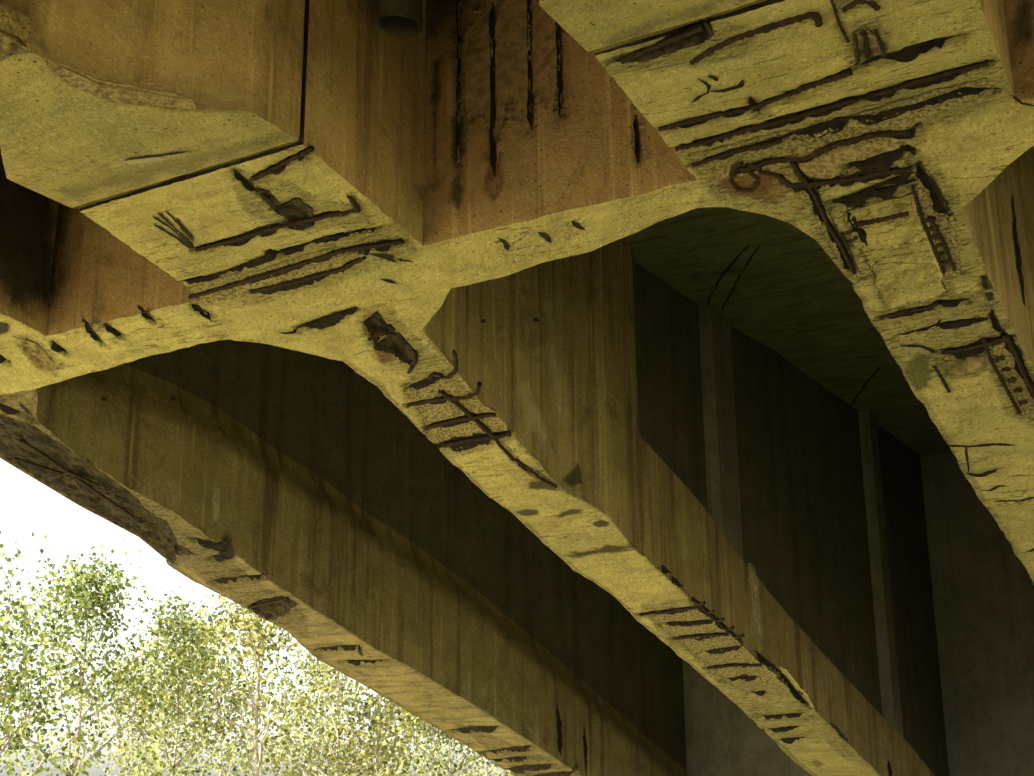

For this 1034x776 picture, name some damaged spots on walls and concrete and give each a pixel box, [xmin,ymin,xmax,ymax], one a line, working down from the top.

spalling [615,12,823,65]
damp [1014,0,1033,42]
spalling [658,0,996,308]
damp [0,149,70,315]
spalling [153,146,404,314]
spalling [21,339,66,372]
spalling [80,316,121,343]
spalling [279,307,557,489]
spalling [0,415,234,562]
spalling [249,596,297,620]
spalling [452,726,498,734]
spalling [486,703,588,776]